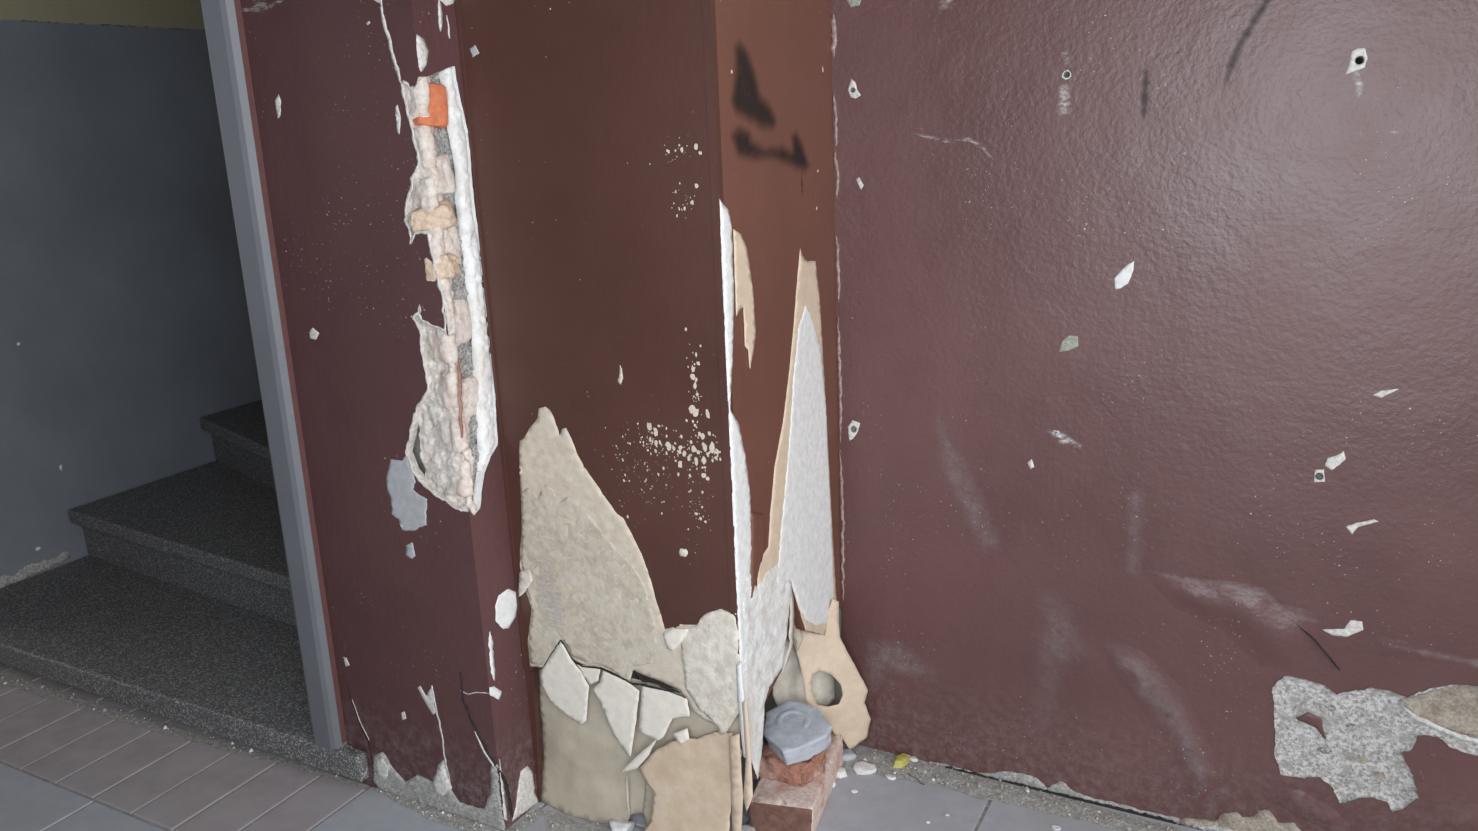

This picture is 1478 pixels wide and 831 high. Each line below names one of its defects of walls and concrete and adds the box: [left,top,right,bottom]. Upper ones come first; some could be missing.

spalling [1345,48,1368,74]
flaking render [366,0,498,559]
peeling [719,199,756,714]
peeling [836,236,860,602]
flaking render [373,752,538,831]
peeling [541,641,690,757]
flaking render [1272,676,1478,813]